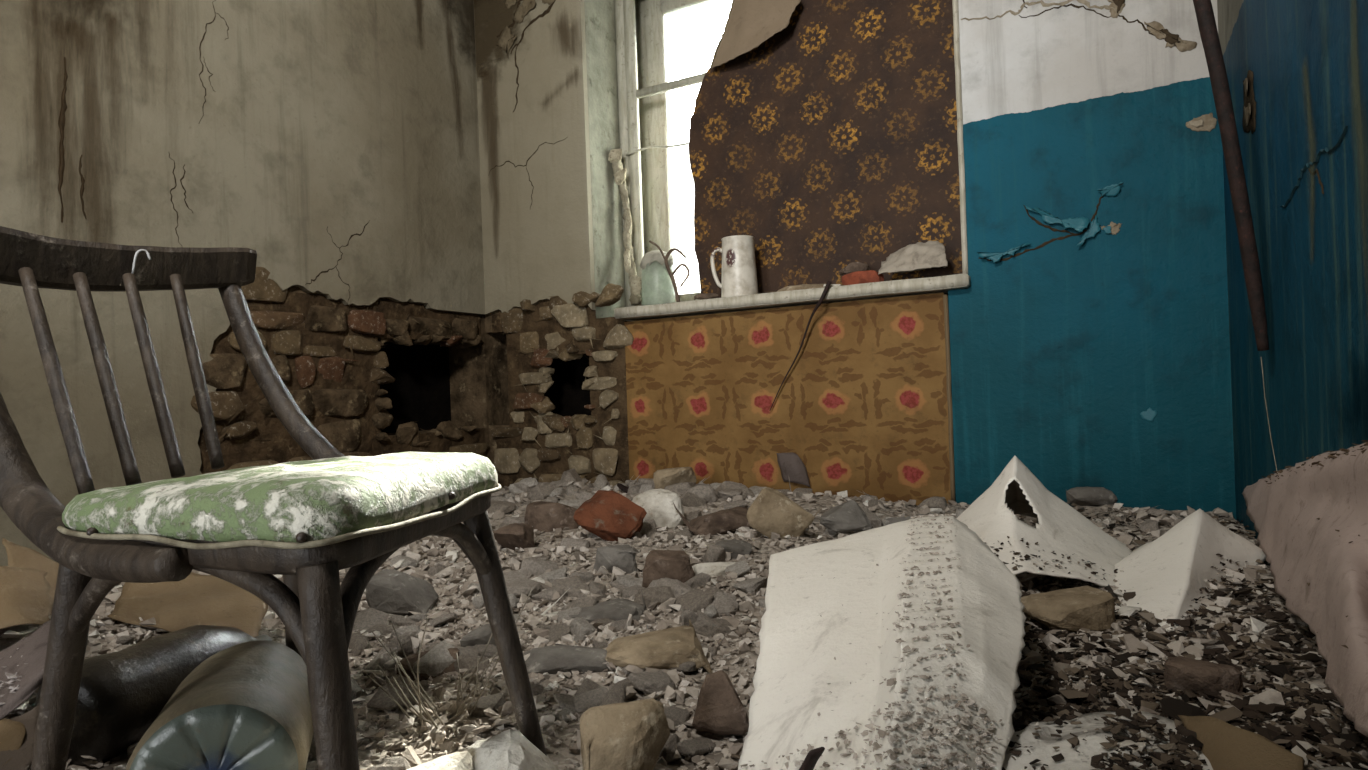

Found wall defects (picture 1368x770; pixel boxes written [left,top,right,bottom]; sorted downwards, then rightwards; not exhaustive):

crack [199,0,229,123]
flaking render [496,0,555,112]
crack [961,0,1154,36]
spalling [1107,0,1126,18]
spalling [1144,21,1197,52]
leakage [58,57,87,223]
peeling [977,182,1123,263]
spalling [191,324,313,473]
spalling [241,267,634,488]